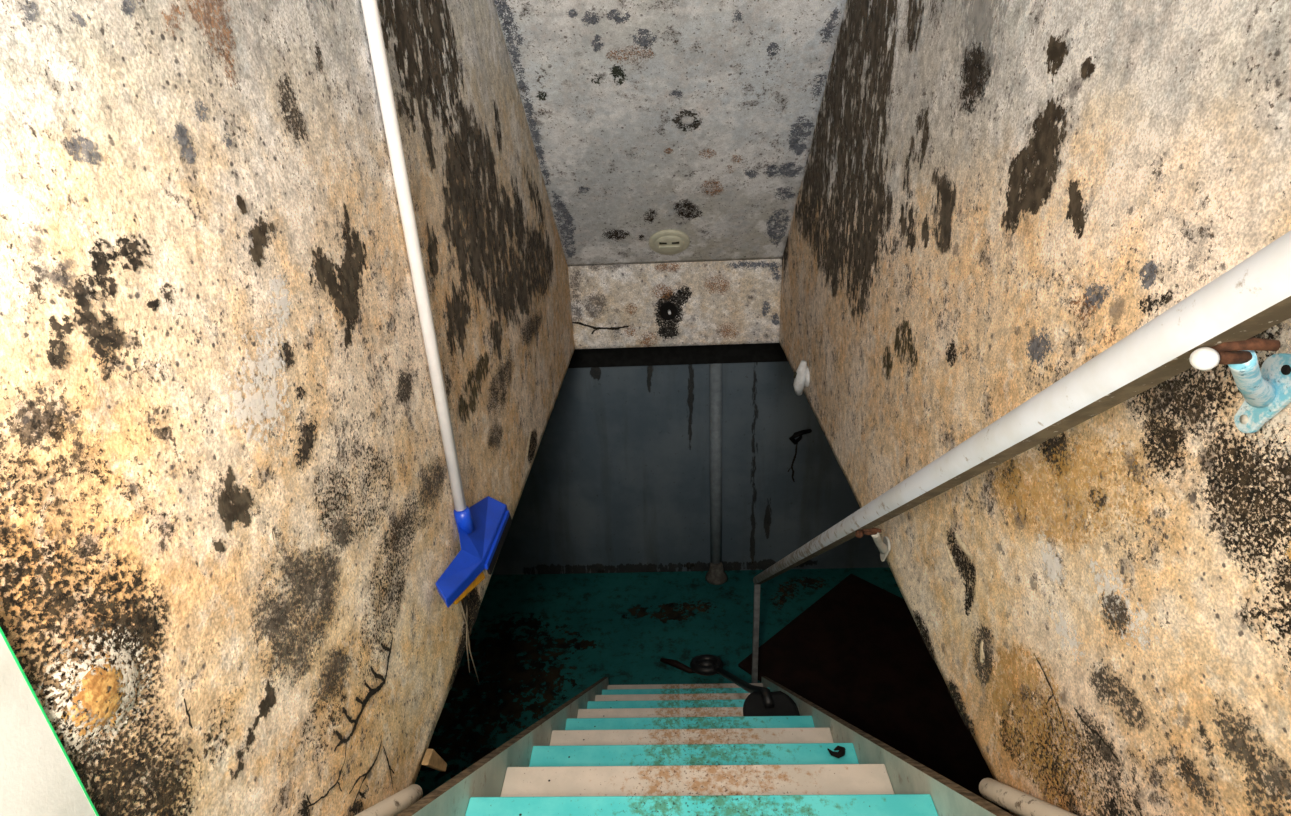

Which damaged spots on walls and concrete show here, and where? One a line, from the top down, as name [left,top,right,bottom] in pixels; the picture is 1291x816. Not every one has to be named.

leakage [567,8,657,52]
leakage [494,0,628,322]
leakage [28,221,152,372]
leakage [146,283,176,311]
leakage [459,308,542,453]
leakage [1136,260,1173,316]
leakage [215,274,447,769]
leakage [991,364,1291,673]
leakage [0,445,242,816]
crack [304,637,394,808]
leakage [985,604,1146,816]
leakage [1172,694,1291,816]